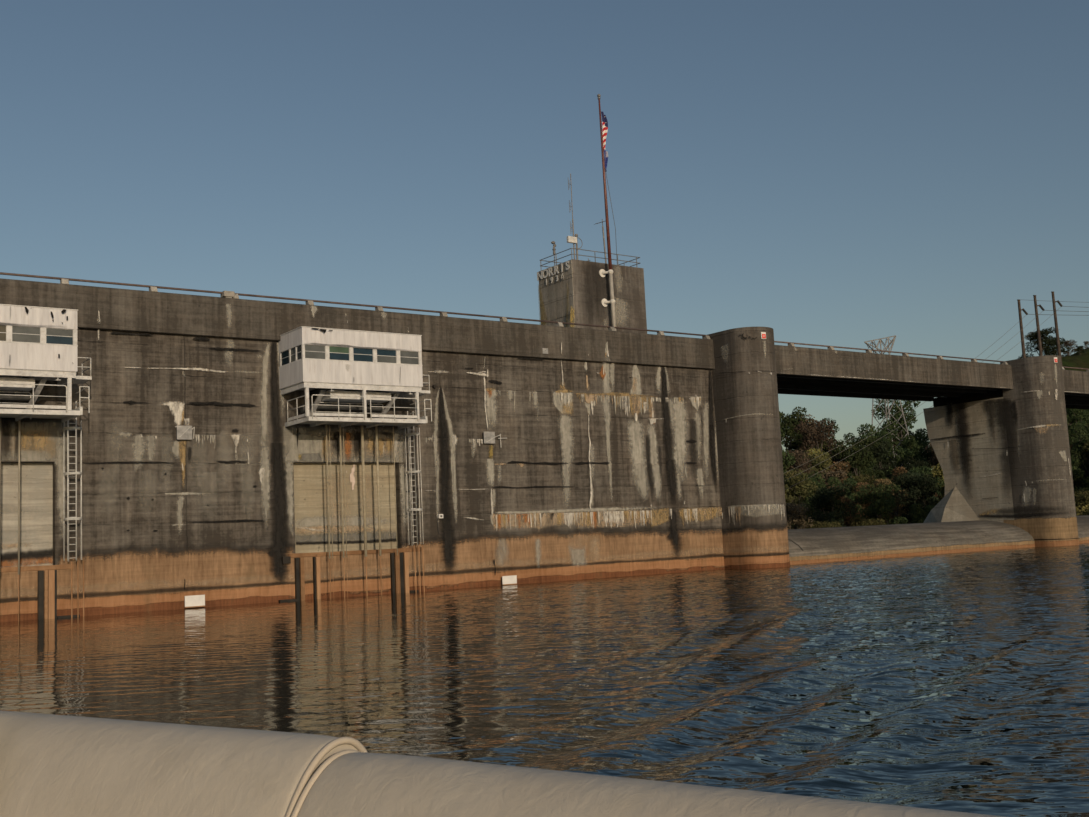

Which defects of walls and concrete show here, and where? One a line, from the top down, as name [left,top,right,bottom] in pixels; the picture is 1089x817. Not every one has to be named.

rust [172,441,191,479]
water stain [426,342,785,570]
water stain [946,400,971,485]
rust [165,492,200,528]
rust [0,507,1089,622]